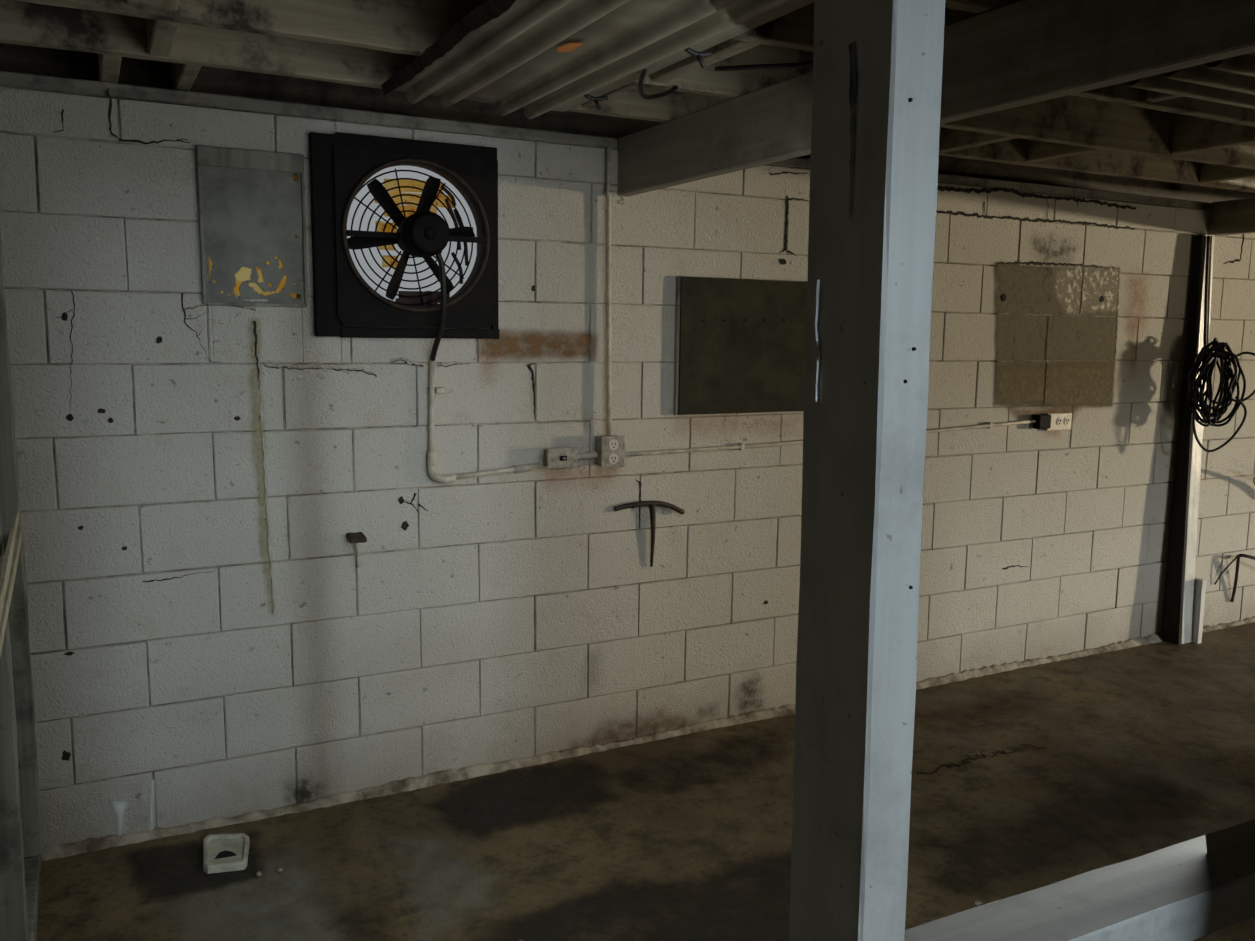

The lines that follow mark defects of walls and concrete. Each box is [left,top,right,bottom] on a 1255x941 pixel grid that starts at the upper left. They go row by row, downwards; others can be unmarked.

crack [106,88,190,144]
crack [936,186,1136,230]
crack [181,293,221,363]
corrosion [482,333,595,358]
crack [916,744,1048,774]